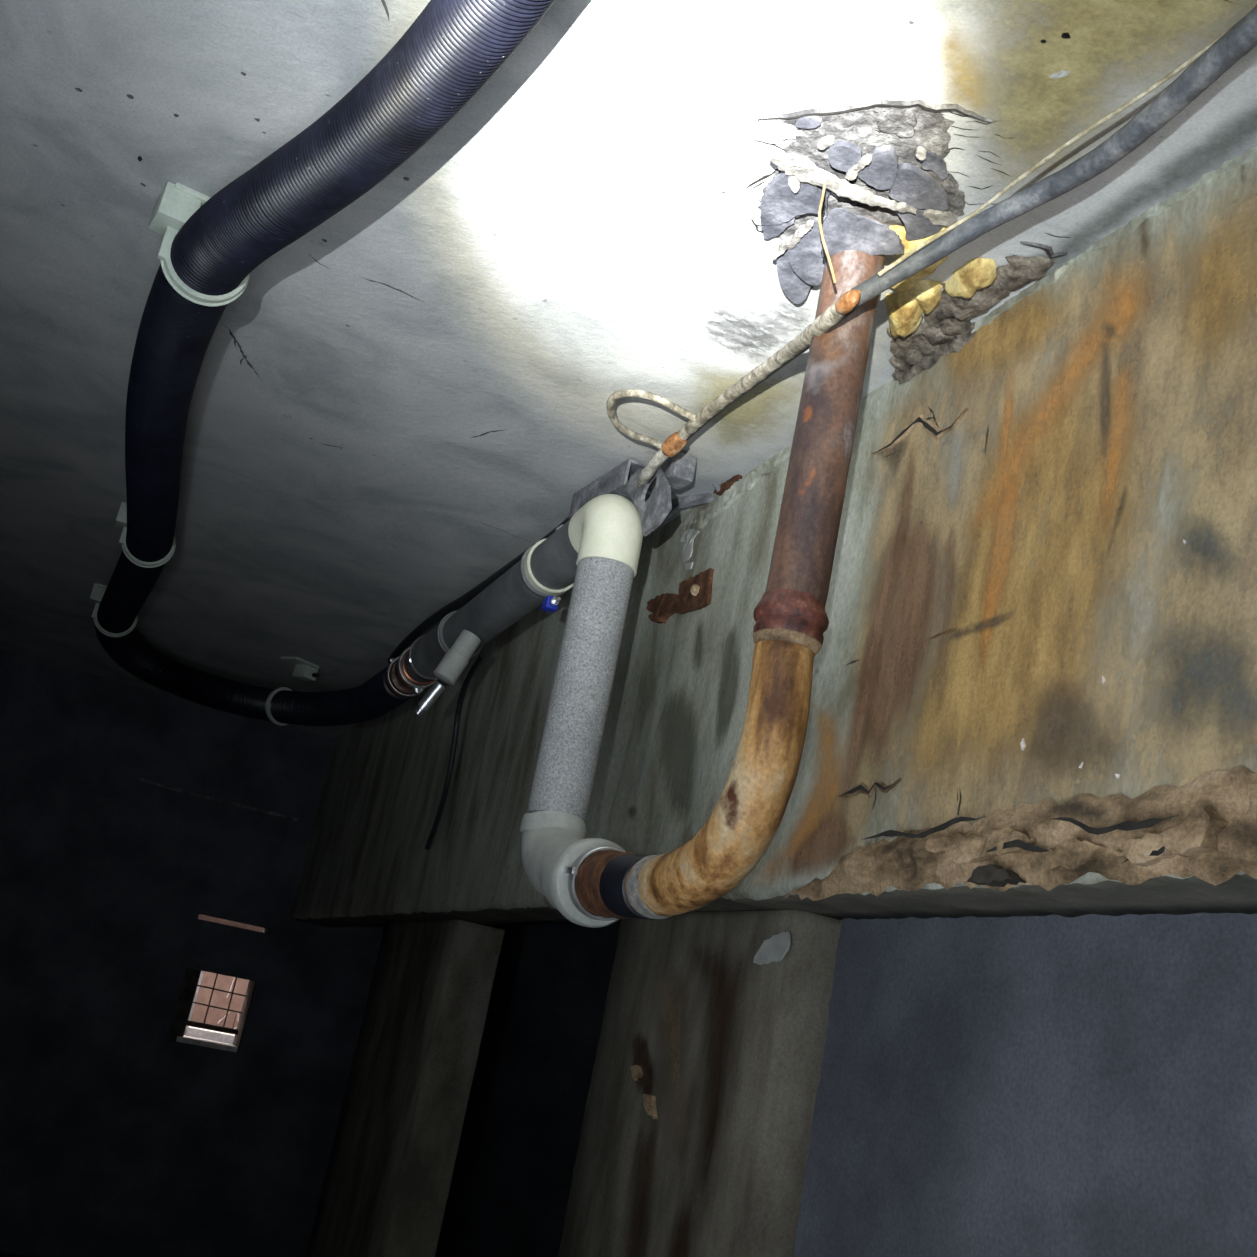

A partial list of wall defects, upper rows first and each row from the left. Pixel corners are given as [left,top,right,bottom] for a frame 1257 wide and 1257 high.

flaking render [706,105,965,357]
spalling [887,255,1054,385]
crack [872,407,989,458]
rust [916,288,1136,767]
leakage [1171,644,1257,720]
crack [838,778,901,809]
spalling [781,766,1257,900]